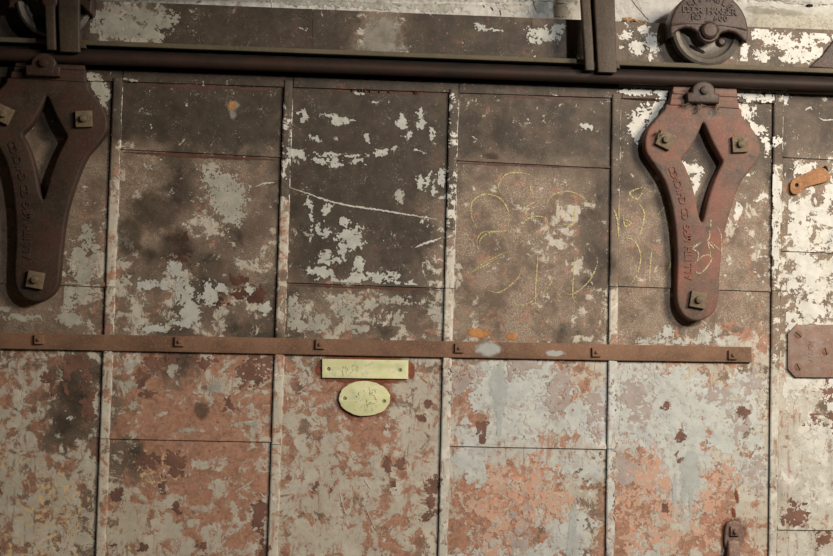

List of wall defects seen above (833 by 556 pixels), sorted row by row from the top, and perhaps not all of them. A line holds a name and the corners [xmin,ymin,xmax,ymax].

crack [747,0,827,27]
peeling [617,25,662,62]
peeling [740,29,833,65]
peeling [395,107,436,141]
peeling [616,86,670,147]
peeling [281,133,397,168]
peeling [415,164,452,200]
peeling [682,160,708,195]
peeling [305,195,432,286]
peeling [782,377,833,458]
corrosion [721,490,746,536]
peeling [780,497,832,551]